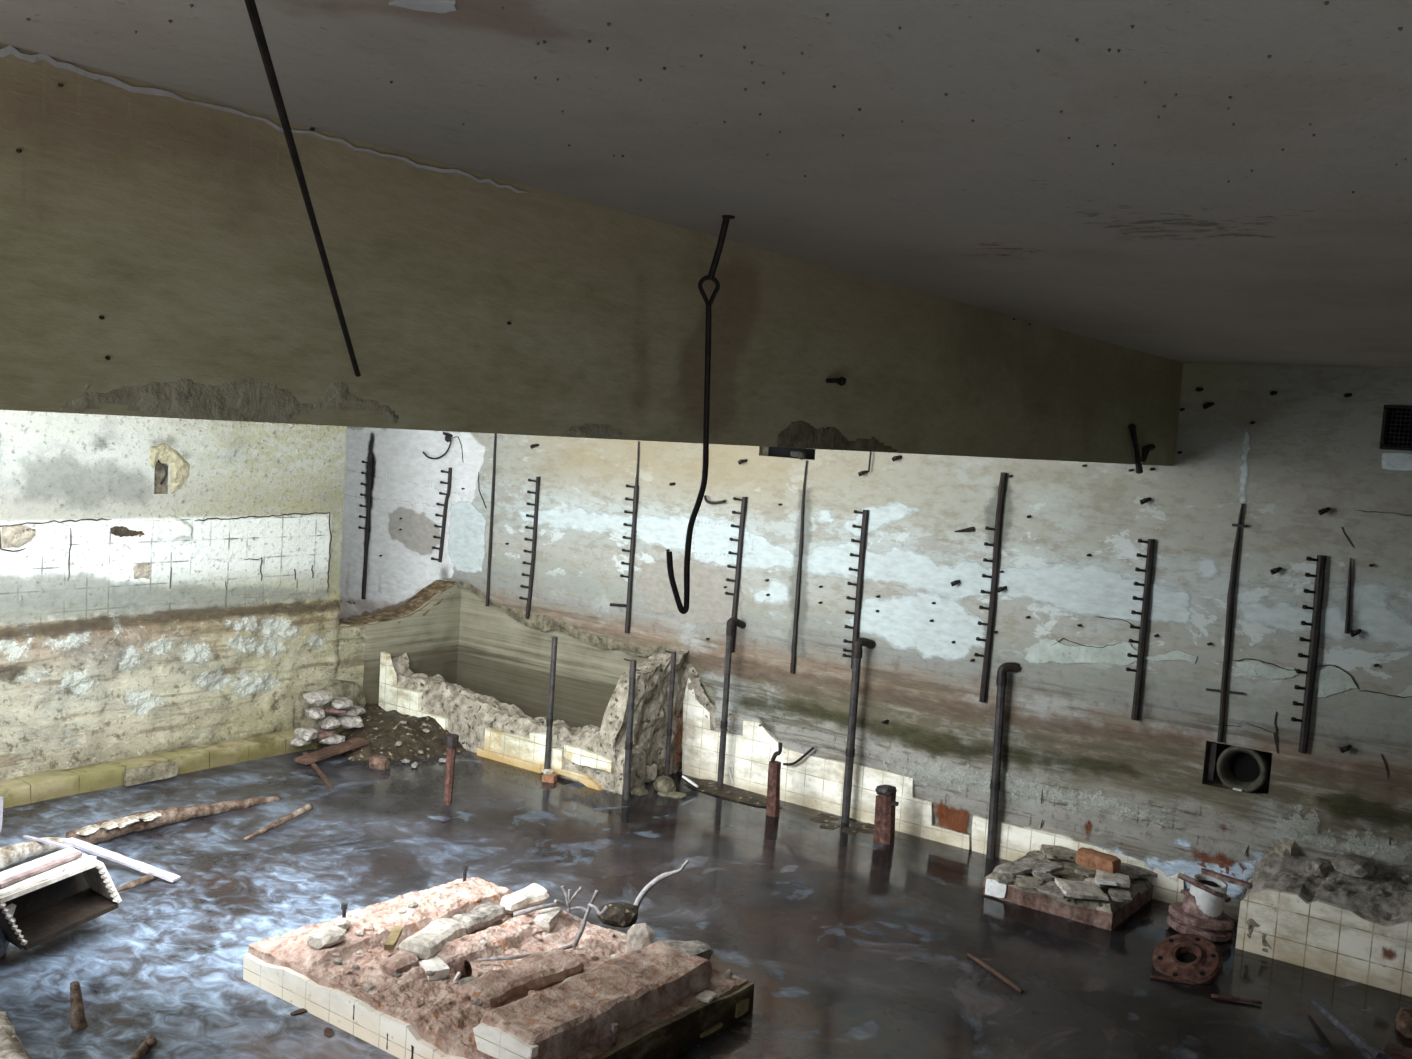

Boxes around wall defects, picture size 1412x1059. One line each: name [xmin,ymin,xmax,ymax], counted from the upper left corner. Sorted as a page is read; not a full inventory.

crack [0,45,527,193]
spalling [777,421,897,452]
spalling [1,524,36,548]
peeling [60,377,668,657]
peeling [519,503,1190,660]
peeling [1239,583,1412,648]
spalling [684,663,716,730]
peeling [1025,638,1197,665]
peeling [1236,660,1298,679]
crack [1233,658,1412,698]
peeling [1316,666,1357,698]
corrosion [935,801,968,834]